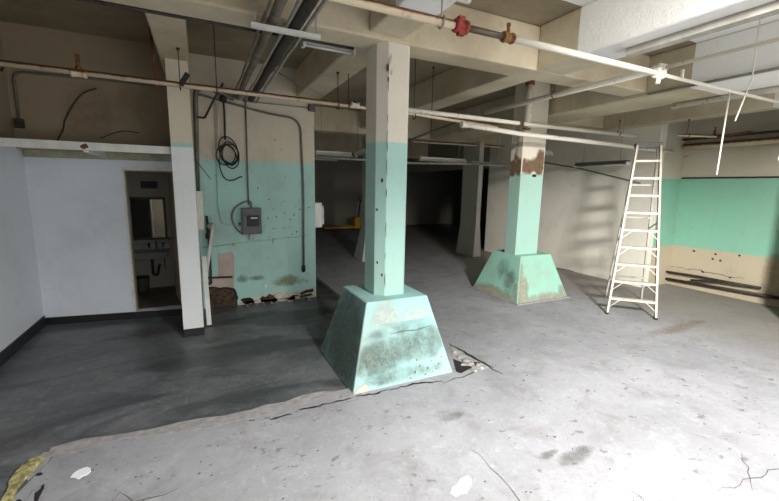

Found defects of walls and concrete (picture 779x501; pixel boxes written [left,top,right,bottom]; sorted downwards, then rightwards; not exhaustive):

peeling [1,455,44,501]
crack [472,450,520,501]
crack [718,457,779,491]